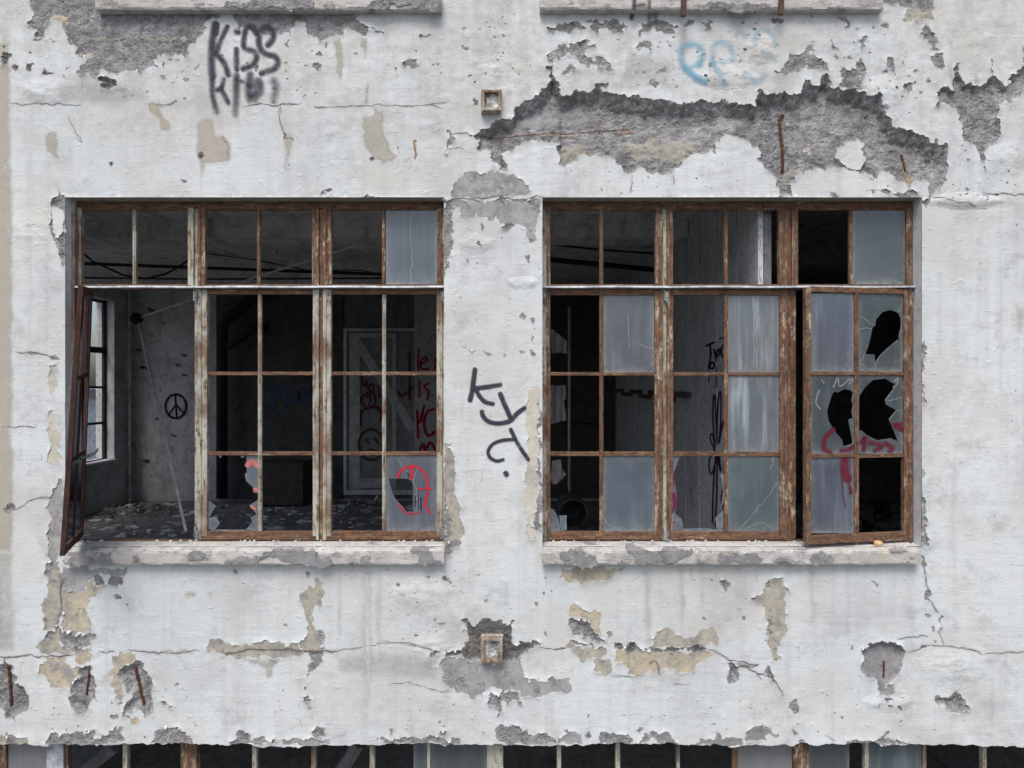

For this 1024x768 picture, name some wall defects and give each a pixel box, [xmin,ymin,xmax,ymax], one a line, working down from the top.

peeling [0,0,442,98]
spalling [444,0,1024,276]
spalling [0,662,31,721]
crack [0,580,72,665]
spalling [46,660,179,746]
crack [100,647,199,655]
crack [227,642,437,654]
flaking render [403,595,678,745]
peeling [568,618,713,654]
flaking render [696,700,779,747]
spalling [851,641,908,722]
crack [901,565,1024,654]